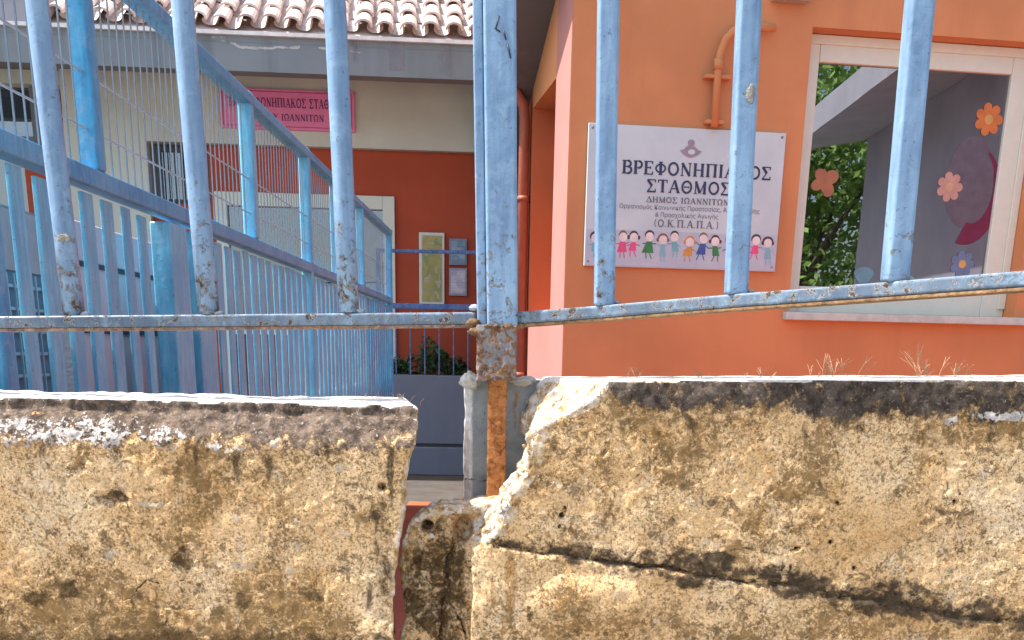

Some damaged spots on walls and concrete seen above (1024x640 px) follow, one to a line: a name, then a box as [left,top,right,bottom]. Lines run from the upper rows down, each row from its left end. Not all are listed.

water stain [607,380,1024,442]
spalling [474,382,611,542]
water stain [0,397,417,610]
crack [492,544,1019,621]
water stain [90,626,197,640]
water stain [210,630,351,640]